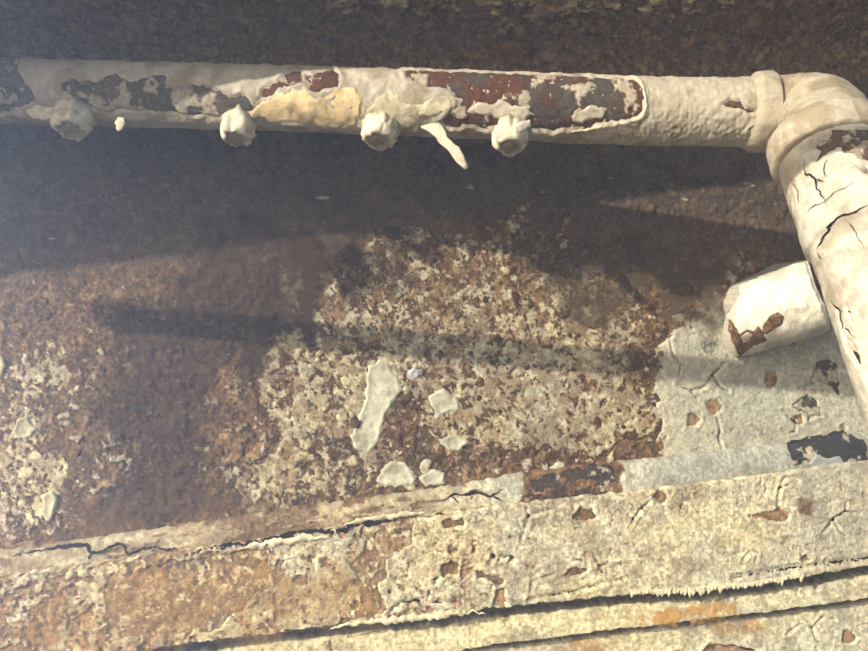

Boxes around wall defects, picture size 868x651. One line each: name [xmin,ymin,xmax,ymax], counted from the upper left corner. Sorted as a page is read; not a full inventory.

peeling [262,70,339,97]
peeling [59,74,254,132]
peeling [405,70,648,170]
crack [792,159,868,259]
peeling [212,201,672,515]
peeling [0,303,104,549]
rust [350,414,362,428]
rust [527,463,617,501]
crack [411,489,503,518]
crack [9,537,174,560]
rust [653,602,736,625]
rust [842,631,856,643]